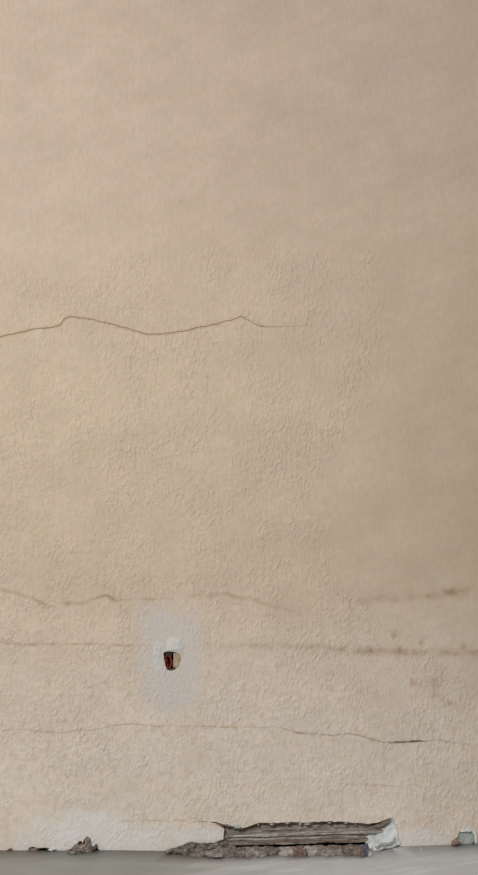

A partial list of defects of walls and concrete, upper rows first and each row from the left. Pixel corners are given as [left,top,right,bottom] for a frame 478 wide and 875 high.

crack [0,316,303,337]
spalling [165,818,400,858]